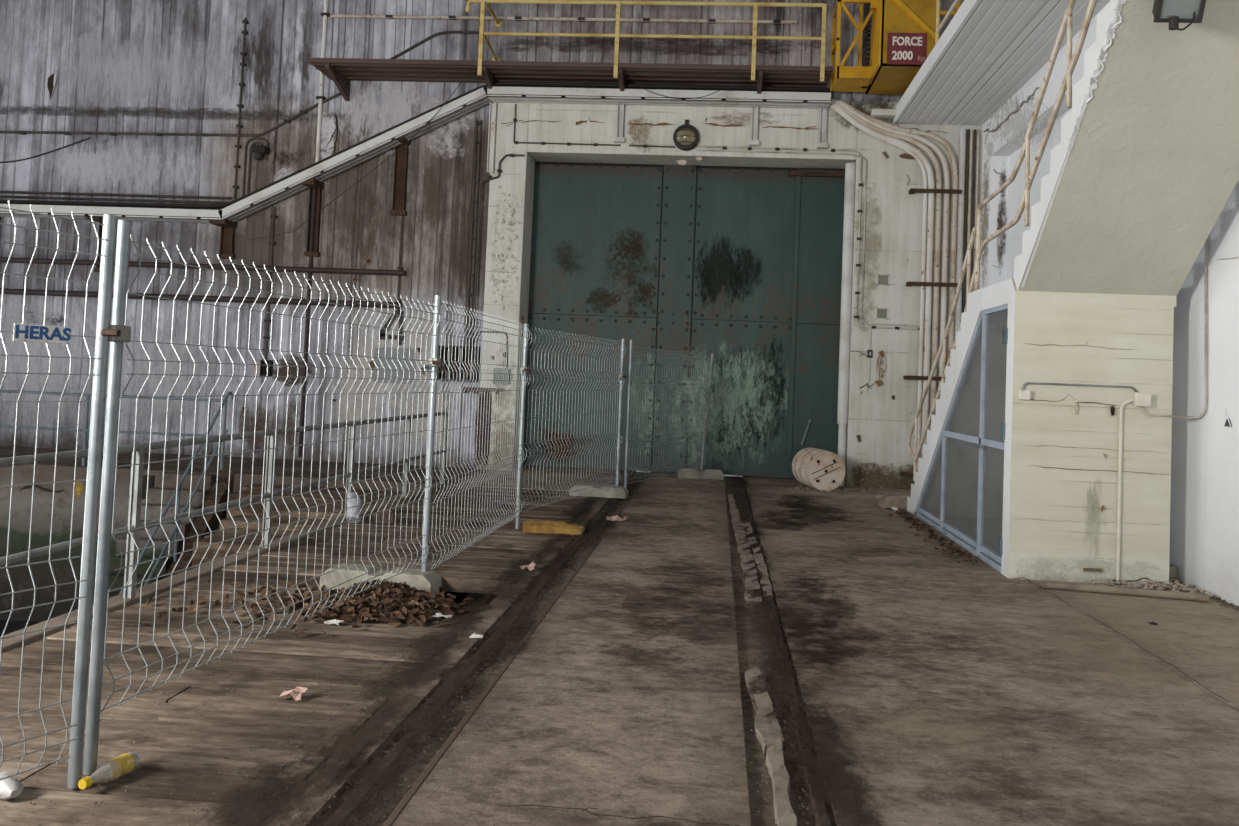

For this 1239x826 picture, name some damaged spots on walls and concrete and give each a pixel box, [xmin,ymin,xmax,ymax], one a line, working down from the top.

water stain [232,21,285,95]
water stain [299,15,311,78]